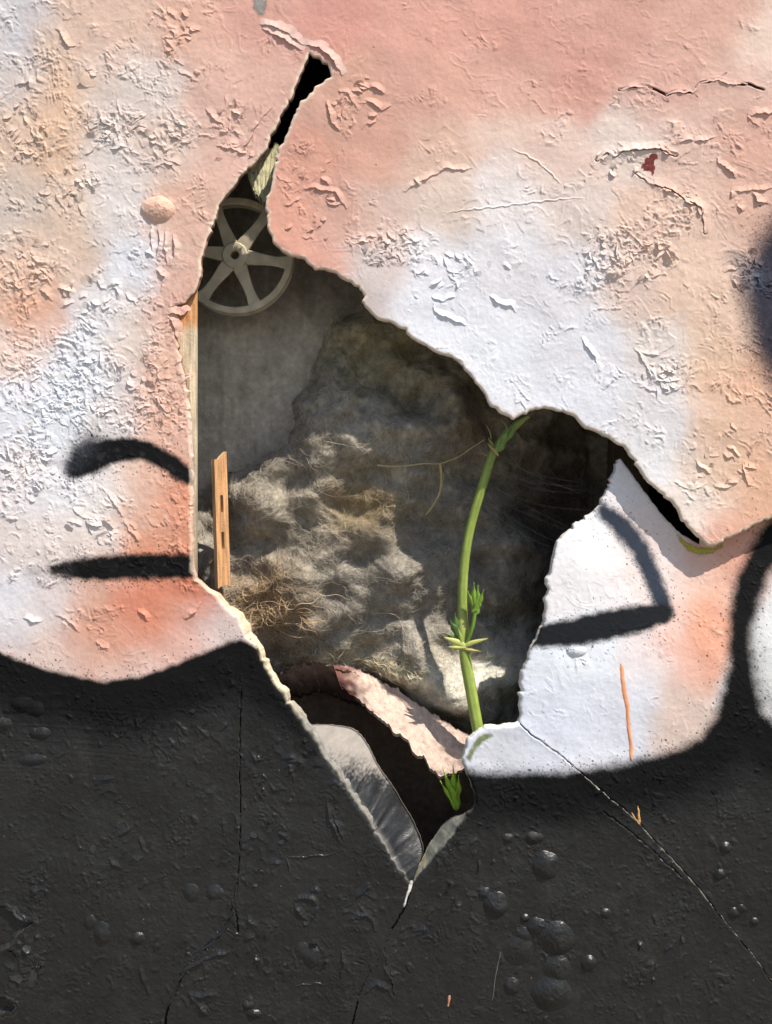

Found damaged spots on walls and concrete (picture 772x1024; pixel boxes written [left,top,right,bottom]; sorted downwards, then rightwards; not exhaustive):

spalling [206,18,391,164]
crack [618,74,764,102]
peeling [277,157,350,240]
peeling [441,147,584,214]
peeling [593,134,716,234]
peeling [354,222,512,326]
peeling [490,293,519,312]
peeling [580,222,676,284]
peeling [633,346,690,400]
spalling [649,484,699,544]
crack [164,691,242,1024]
crack [520,724,772,982]